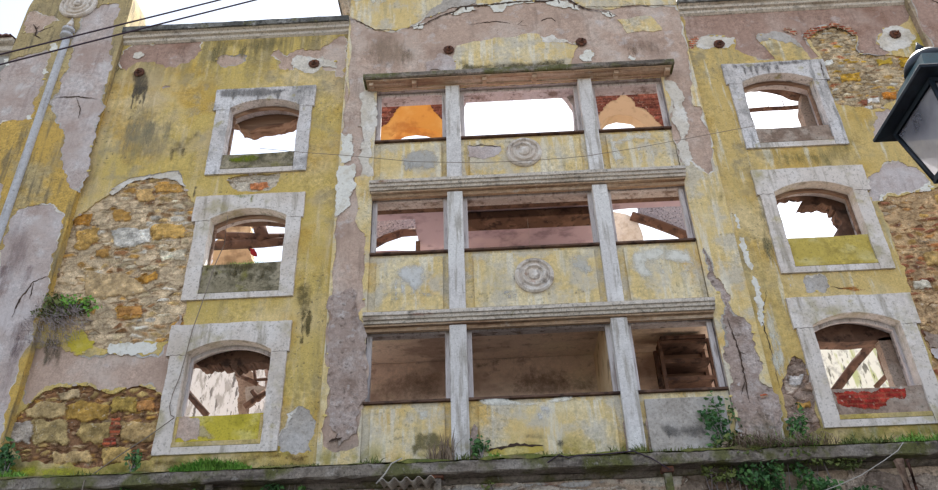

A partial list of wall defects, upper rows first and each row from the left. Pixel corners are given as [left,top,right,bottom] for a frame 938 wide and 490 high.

peeling [0,50,51,124]
peeling [23,11,59,35]
peeling [50,3,203,193]
spalling [0,177,195,469]
damp [297,286,311,343]
peeling [271,0,938,453]